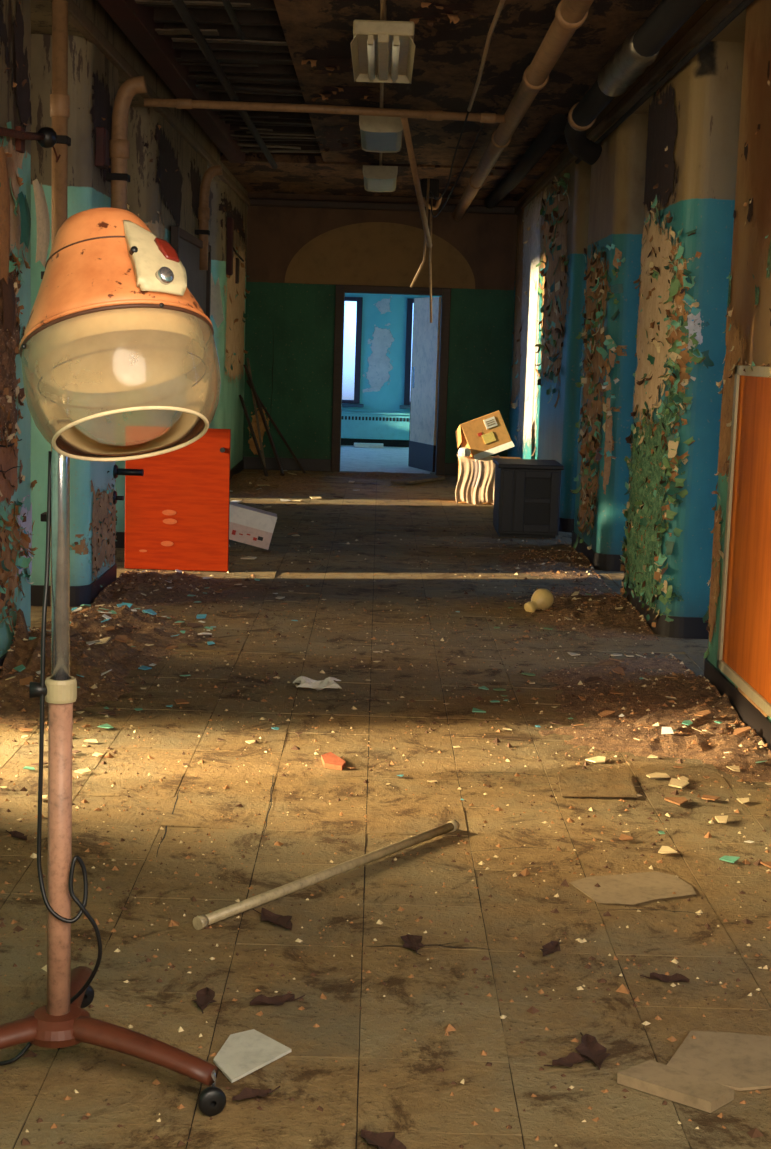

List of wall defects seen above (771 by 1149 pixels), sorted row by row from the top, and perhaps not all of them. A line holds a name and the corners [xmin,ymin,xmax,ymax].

damp [695,41,716,77]
spalling [0,0,50,635]
peeling [362,296,394,393]
peeling [510,85,771,658]
peeling [70,471,118,587]